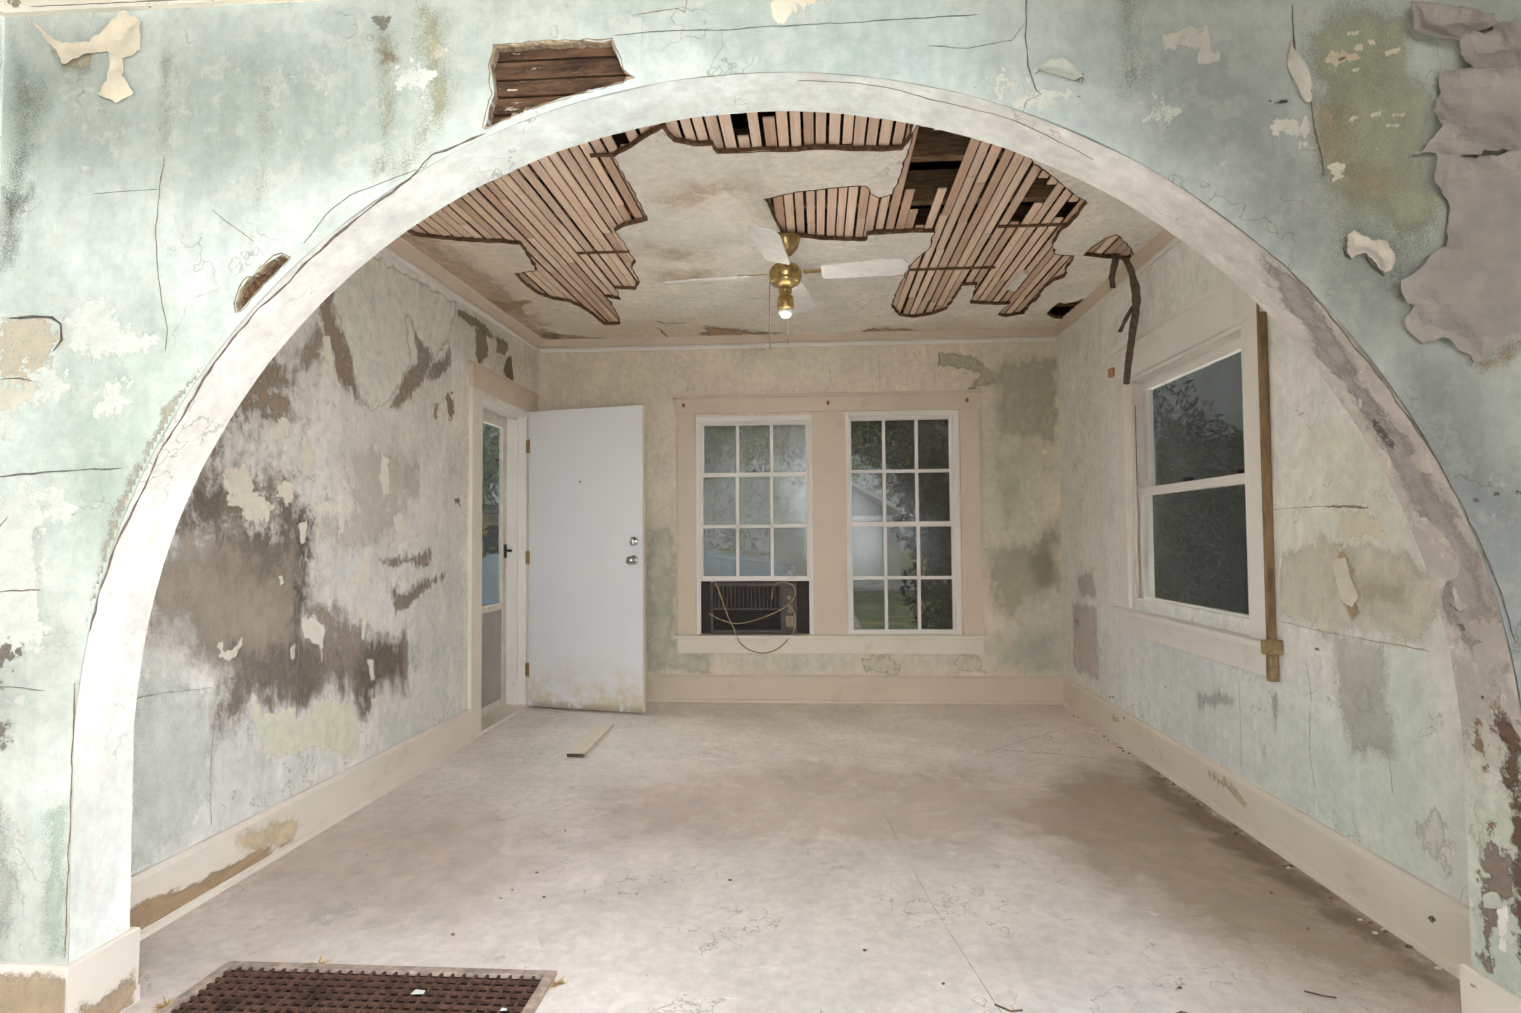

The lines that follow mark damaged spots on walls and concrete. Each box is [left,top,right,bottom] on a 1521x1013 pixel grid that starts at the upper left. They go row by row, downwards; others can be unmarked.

peeling [26,10,141,103]
spalling [482,38,635,129]
peeling [770,0,824,24]
spalling [406,123,1134,325]
peeling [1327,162,1345,183]
peeling [1343,1,1521,362]
water stain [391,334,455,421]
flaking render [1264,262,1501,648]
water stain [131,292,418,869]
water stain [380,548,444,611]
peeling [1472,665,1521,974]